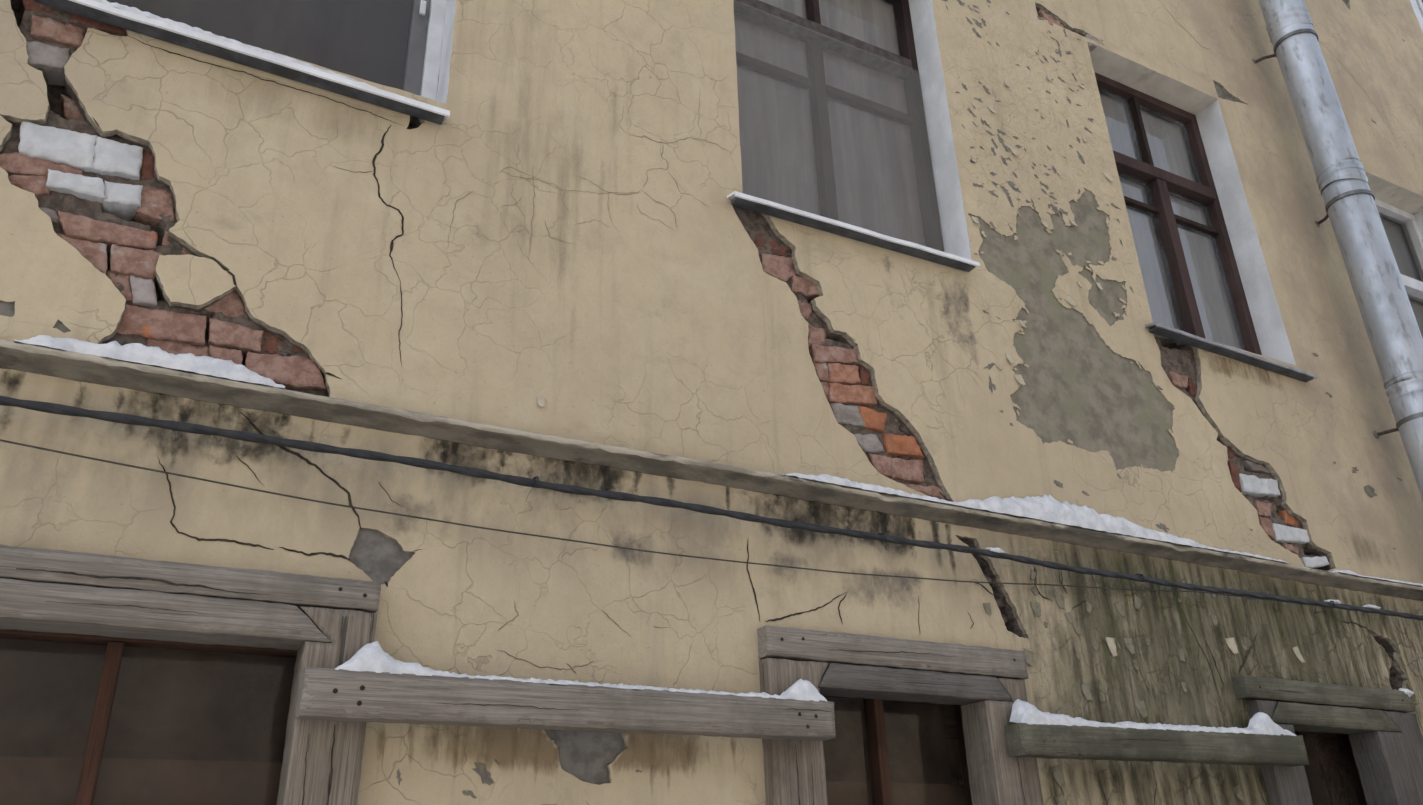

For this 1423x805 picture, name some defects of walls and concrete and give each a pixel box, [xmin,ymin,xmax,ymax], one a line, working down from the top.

spalling [0,0,341,397]
crack [129,36,405,364]
peeling [955,2,1196,479]
spalling [732,205,945,500]
leakage [149,392,287,458]
crack [158,412,403,560]
leakage [547,458,638,491]
crack [747,542,848,624]
leakage [757,495,914,550]
leakage [931,521,955,568]
crack [968,553,1007,629]
spalling [1217,439,1329,571]